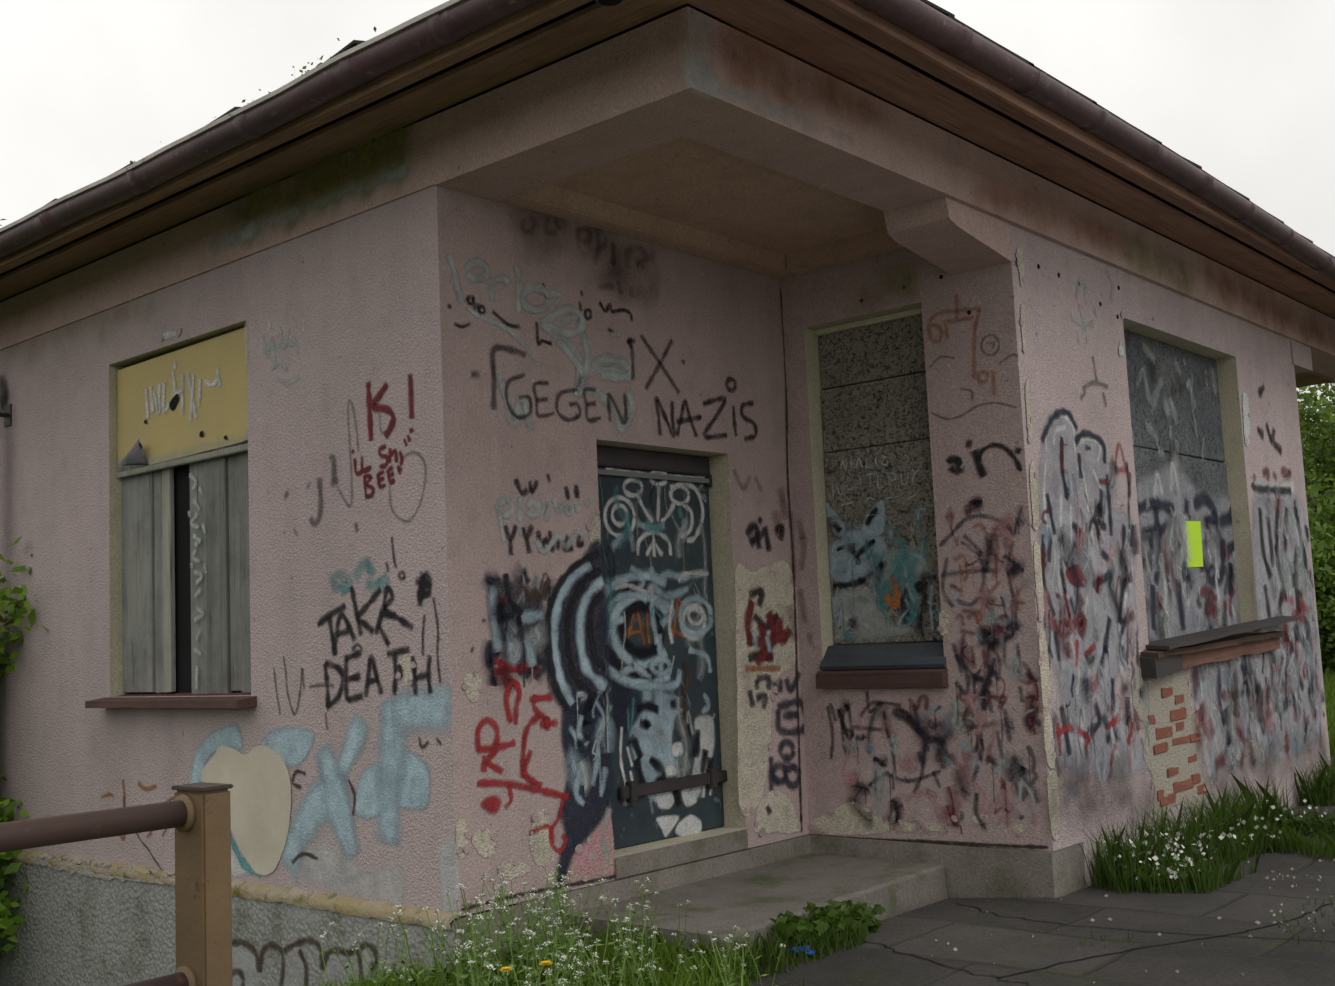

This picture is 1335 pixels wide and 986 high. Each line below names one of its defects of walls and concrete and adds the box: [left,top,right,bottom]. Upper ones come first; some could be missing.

flaking render [1131,663,1213,825]